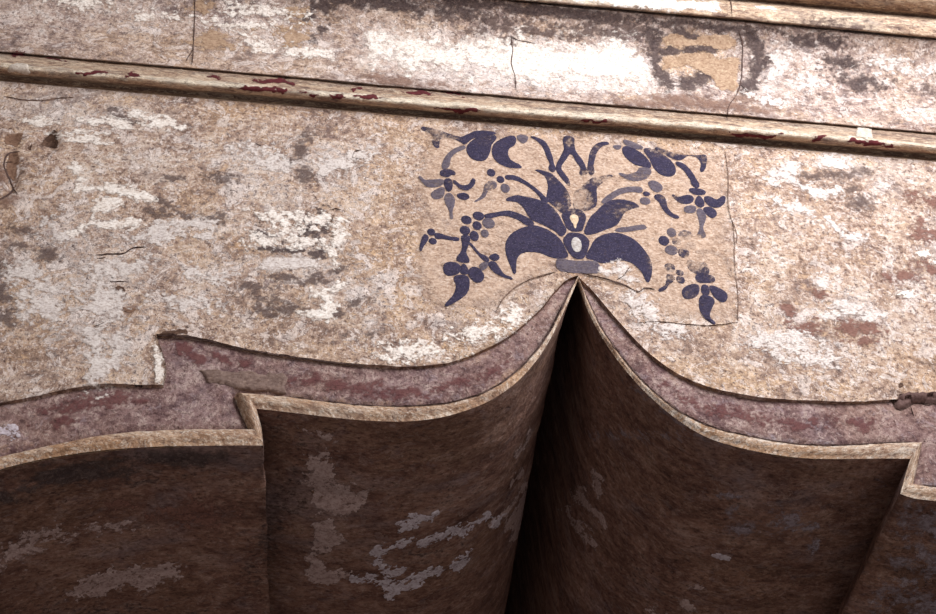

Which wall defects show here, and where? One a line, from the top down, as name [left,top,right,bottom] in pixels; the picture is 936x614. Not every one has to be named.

crack [186,0,196,62]
peeling [230,78,317,98]
peeling [329,87,381,100]
damp [613,26,783,114]
crack [726,33,747,120]
peeling [729,131,784,140]
crack [0,151,20,200]
peeling [64,559,188,602]